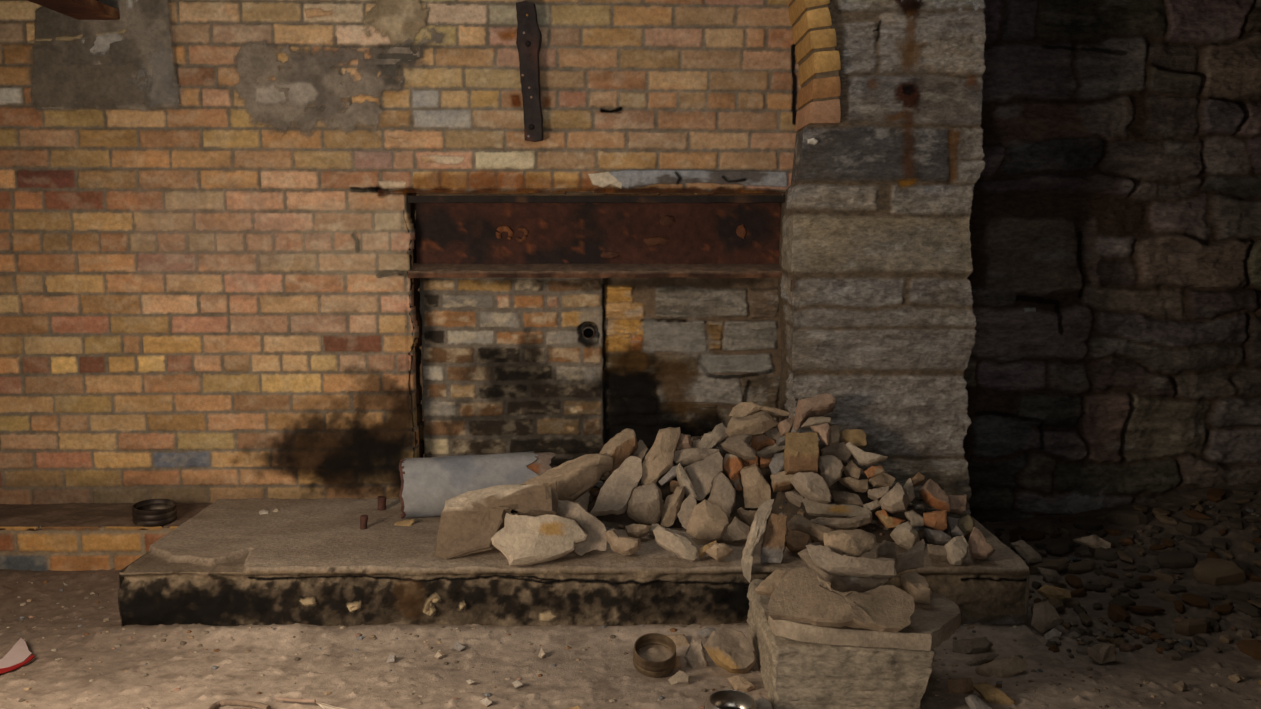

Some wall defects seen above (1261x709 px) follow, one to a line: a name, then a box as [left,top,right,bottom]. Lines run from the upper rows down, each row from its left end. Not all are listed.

rust [895,0,922,16]
rust [888,82,920,187]
rust [378,187,785,196]
leakage [598,349,724,450]